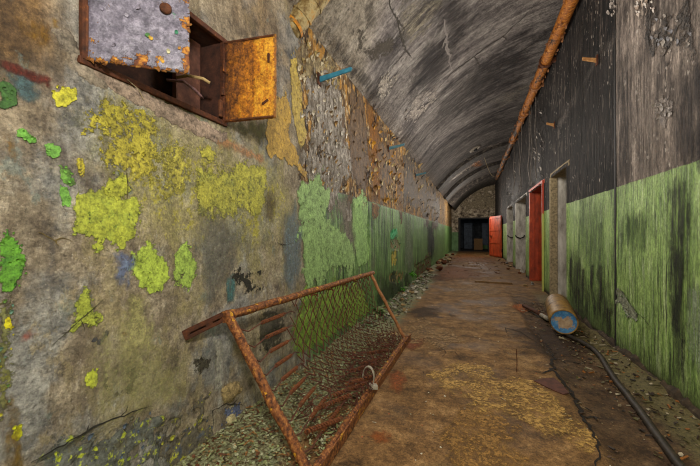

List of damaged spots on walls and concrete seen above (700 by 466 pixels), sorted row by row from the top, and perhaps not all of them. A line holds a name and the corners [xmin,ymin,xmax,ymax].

crack [386,0,411,74]
peeling [633,0,697,67]
damp [228,122,266,143]
peeling [651,95,673,128]
peeling [266,37,441,357]
damp [203,221,264,301]
damp [193,339,222,388]
damp [259,309,284,352]
crack [493,324,601,466]
crack [31,406,147,463]